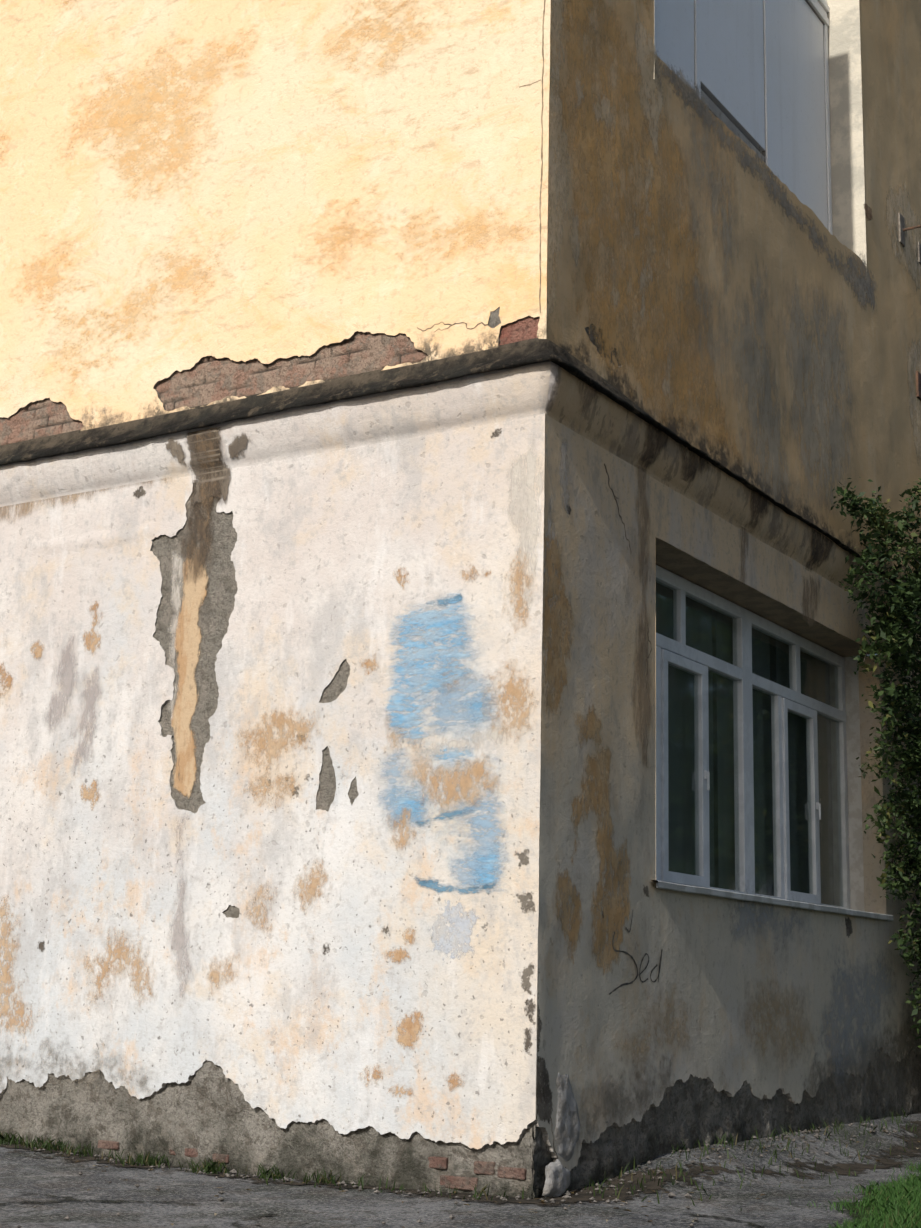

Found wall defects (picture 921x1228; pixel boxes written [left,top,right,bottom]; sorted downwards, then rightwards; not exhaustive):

flaking render [153,331,428,411]
crack [417,322,489,331]
flaking render [0,398,84,446]
leakage [699,278,850,579]
crack [604,463,631,550]
flaking render [150,427,248,813]
peeling [496,538,573,729]
leakage [803,530,833,621]
flaking render [319,659,376,703]
peeling [244,713,359,812]
flaking render [516,891,536,913]
flaking render [0,964,921,1199]